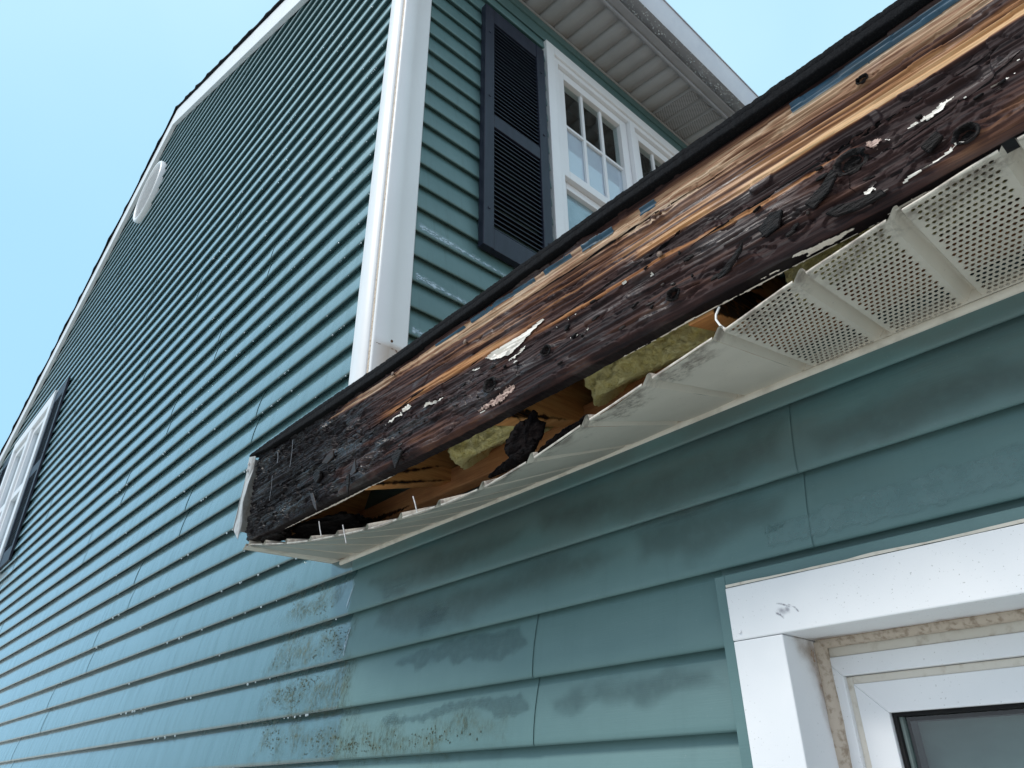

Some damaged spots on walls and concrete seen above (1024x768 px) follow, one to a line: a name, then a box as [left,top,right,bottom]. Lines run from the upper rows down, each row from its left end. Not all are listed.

peeling [907,59,1020,129]
peeling [863,175,889,195]
peeling [903,141,965,184]
peeling [624,190,931,357]
peeling [472,319,544,371]
peeling [462,383,515,413]
peeling [287,477,390,528]